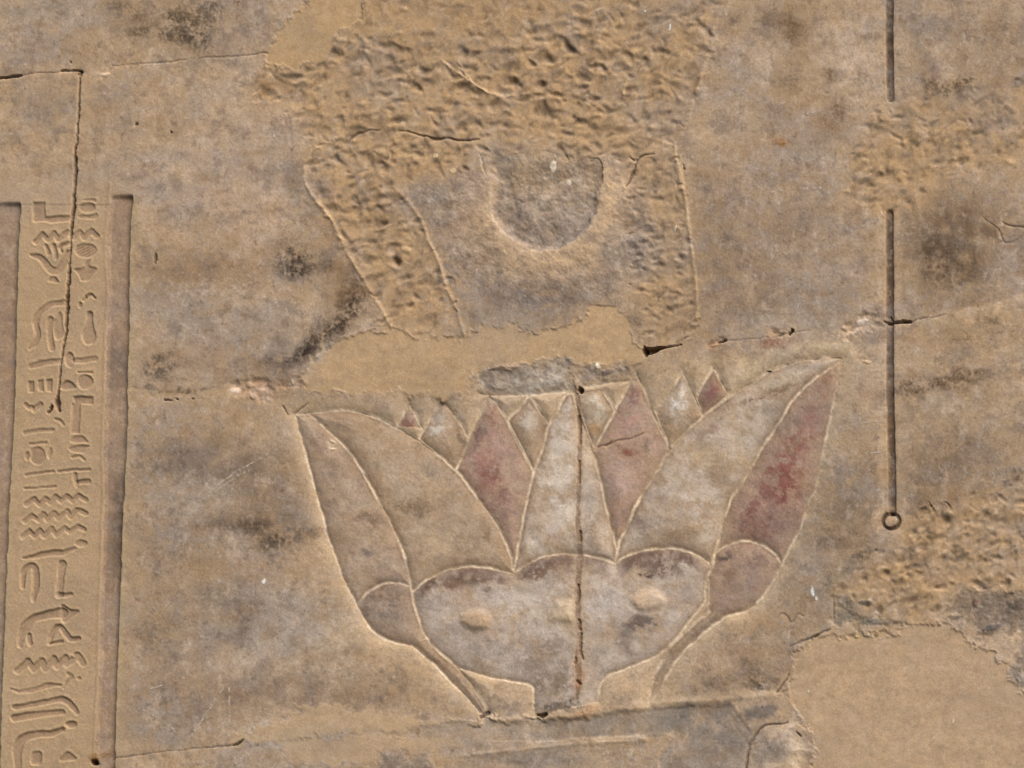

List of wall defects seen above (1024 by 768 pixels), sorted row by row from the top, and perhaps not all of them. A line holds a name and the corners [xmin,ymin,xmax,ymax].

crack [349,129,481,142]
spalling [256,0,736,346]
crack [0,70,84,414]
crack [885,314,945,327]
crack [720,329,812,344]
crack [643,345,682,358]
crack [572,377,645,701]